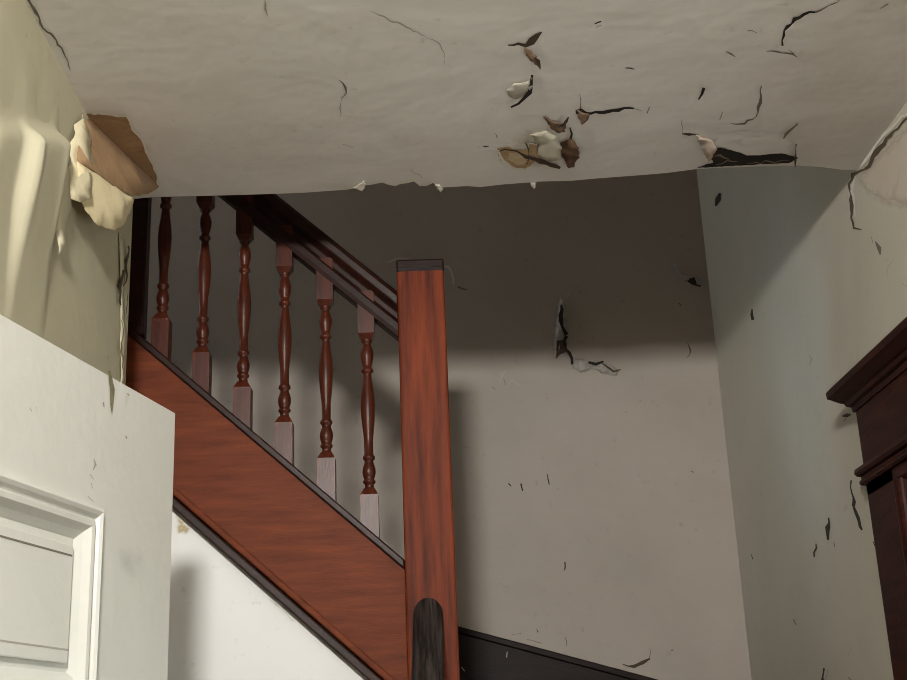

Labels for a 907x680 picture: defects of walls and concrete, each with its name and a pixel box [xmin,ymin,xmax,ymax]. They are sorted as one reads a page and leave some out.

crack [27,0,70,69]
crack [371,11,445,63]
peeling [506,32,542,108]
crack [748,0,839,57]
peeling [483,97,650,171]
spalling [681,86,798,168]
spalling [553,289,621,376]